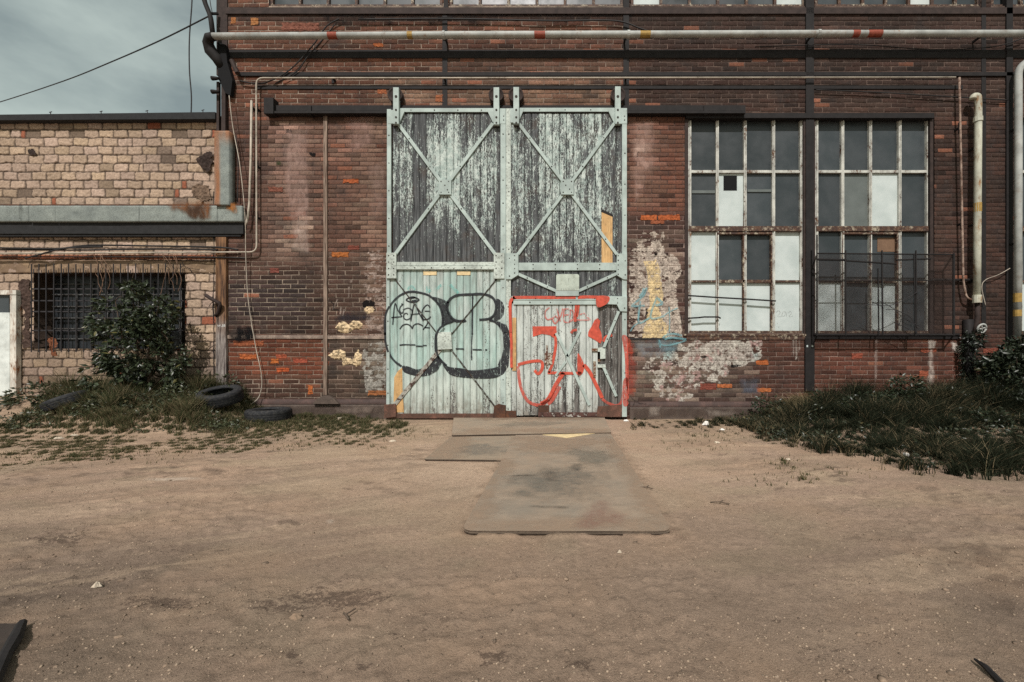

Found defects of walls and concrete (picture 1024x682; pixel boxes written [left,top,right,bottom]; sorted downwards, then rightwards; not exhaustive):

rust [172,202,209,218]
peeling [628,214,769,401]